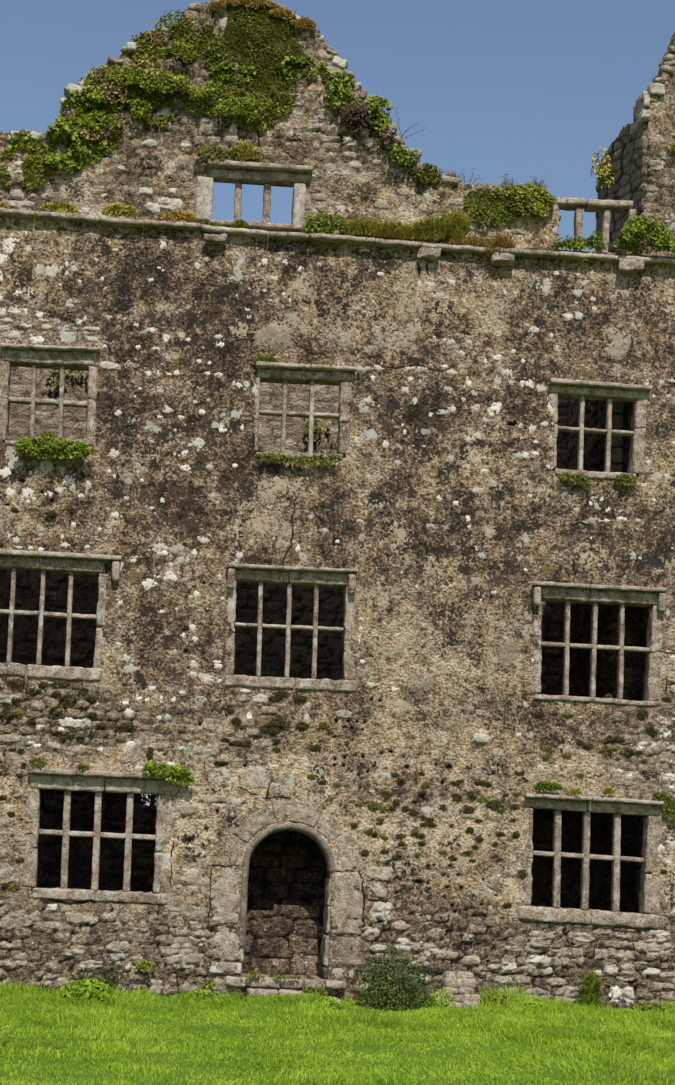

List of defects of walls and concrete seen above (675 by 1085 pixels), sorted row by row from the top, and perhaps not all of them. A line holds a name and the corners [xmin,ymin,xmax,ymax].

leakage [256,348,361,373]
leakage [314,248,400,334]
leakage [417,303,491,360]
leakage [504,280,540,323]
leakage [640,269,675,334]
leakage [362,394,548,671]
leakage [532,452,675,593]